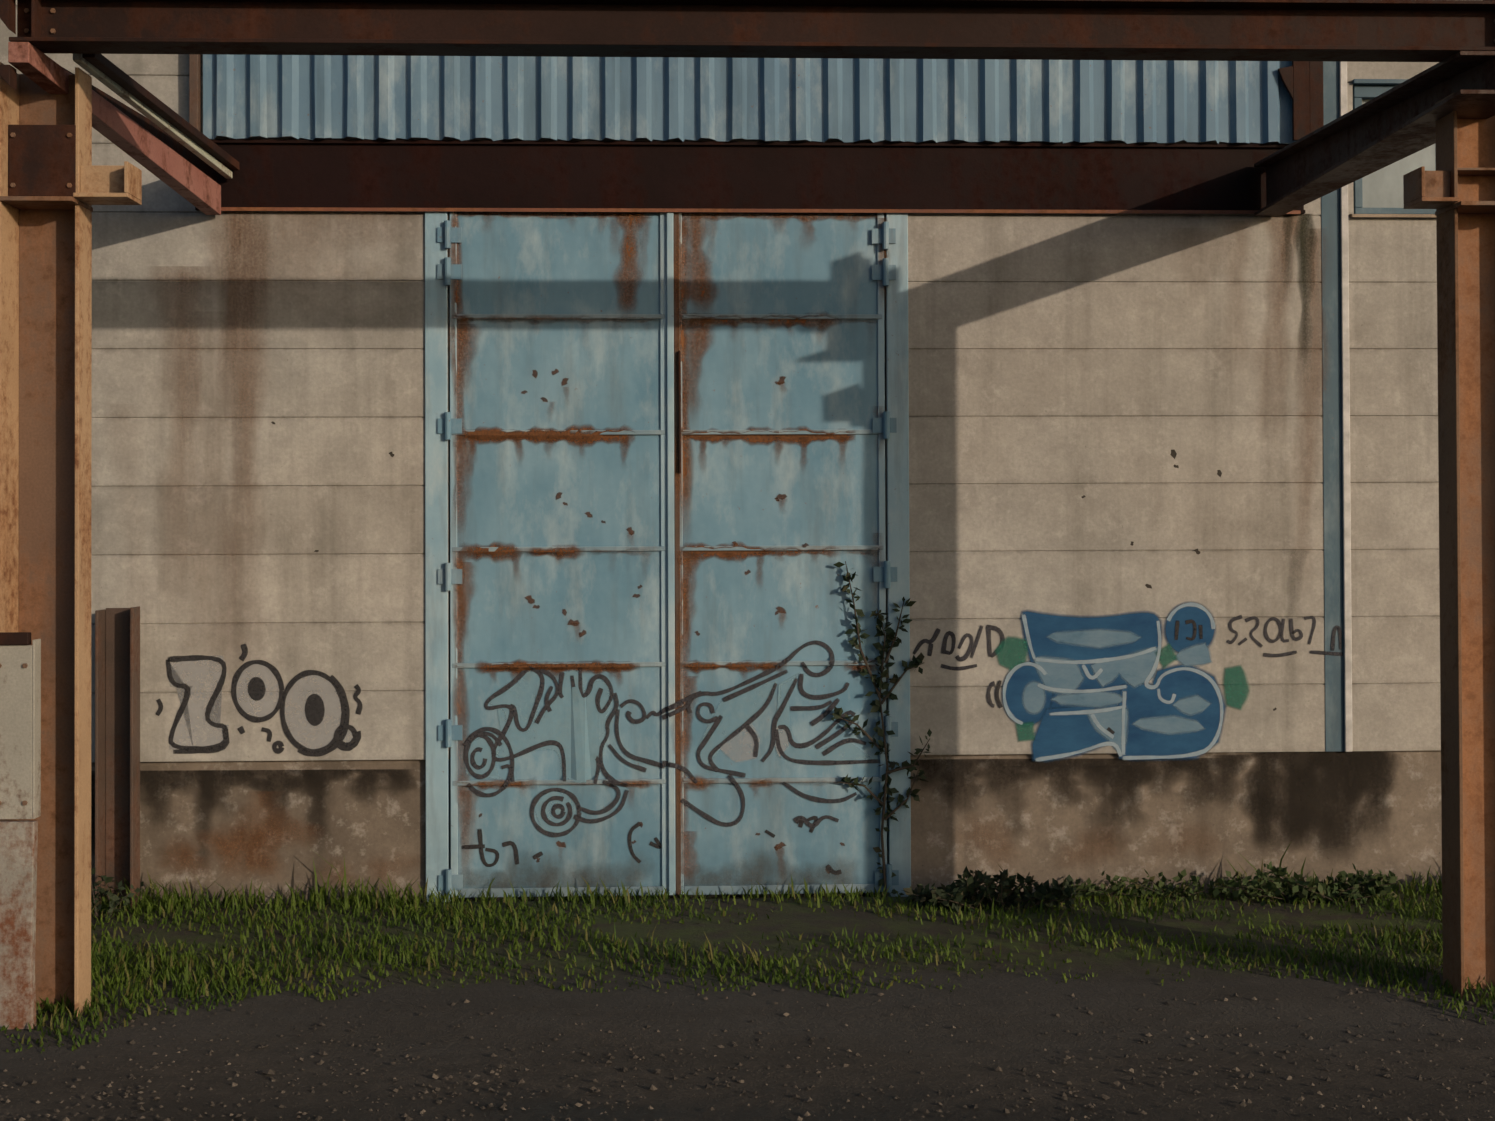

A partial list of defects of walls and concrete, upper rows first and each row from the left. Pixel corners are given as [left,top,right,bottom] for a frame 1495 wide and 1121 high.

corrosion [452,212,643,482]
corrosion [676,213,885,506]
corrosion [455,543,637,746]
damp [140,769,410,822]
damp [913,751,1393,848]